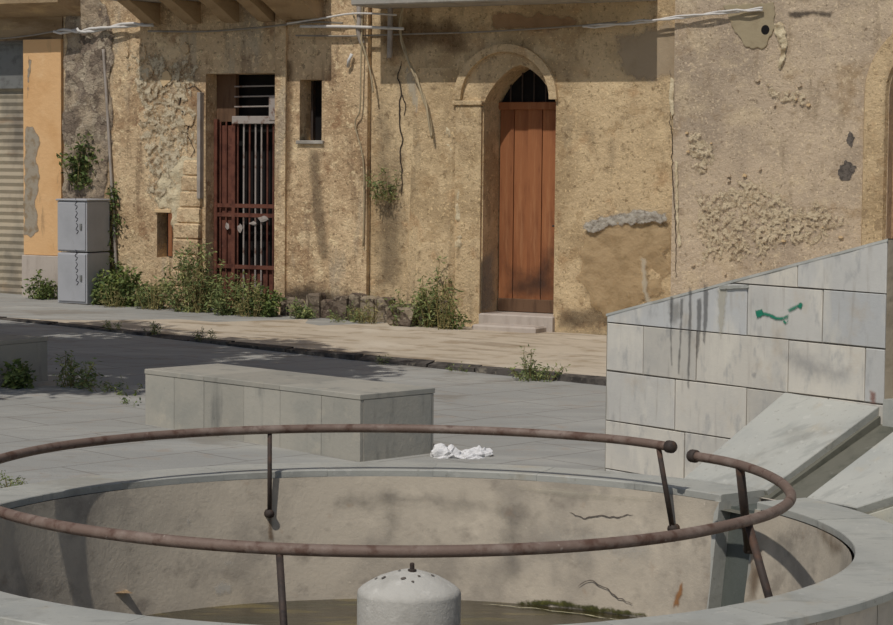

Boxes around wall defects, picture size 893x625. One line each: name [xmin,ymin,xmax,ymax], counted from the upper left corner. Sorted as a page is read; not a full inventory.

crack [397,61,406,192]
peeling [23,127,40,237]
crack [569,511,632,519]
crack [580,580,632,604]